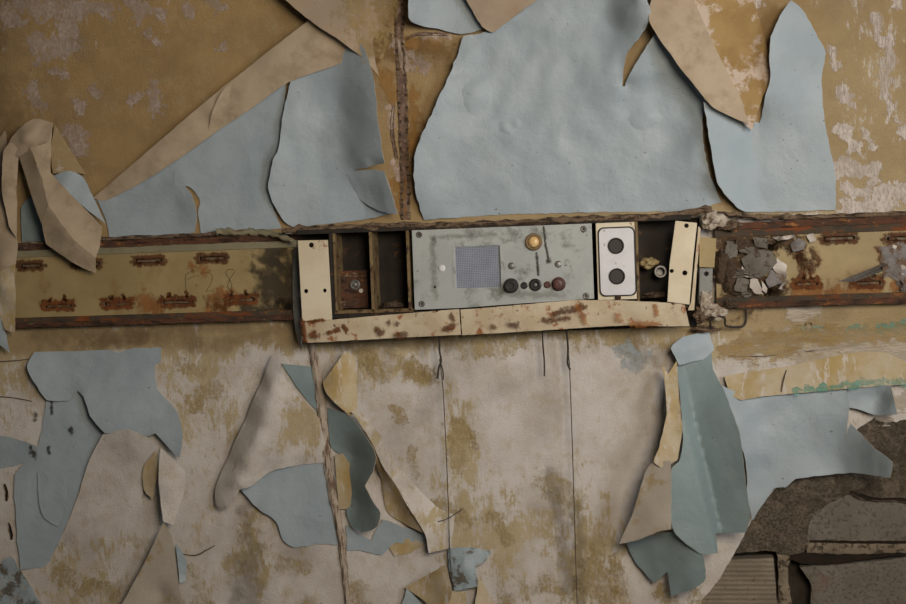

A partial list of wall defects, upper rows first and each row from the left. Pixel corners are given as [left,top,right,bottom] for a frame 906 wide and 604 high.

peeling [0,0,906,353]
rust [788,232,901,295]
rust [38,294,76,312]
rust [99,288,260,314]
rust [300,318,349,343]
rust [375,320,408,339]
leakage [457,332,526,357]
rust [542,303,587,324]
flaking render [619,233,906,604]
peeling [0,347,187,604]
peeling [215,351,495,604]
leakage [539,545,629,604]